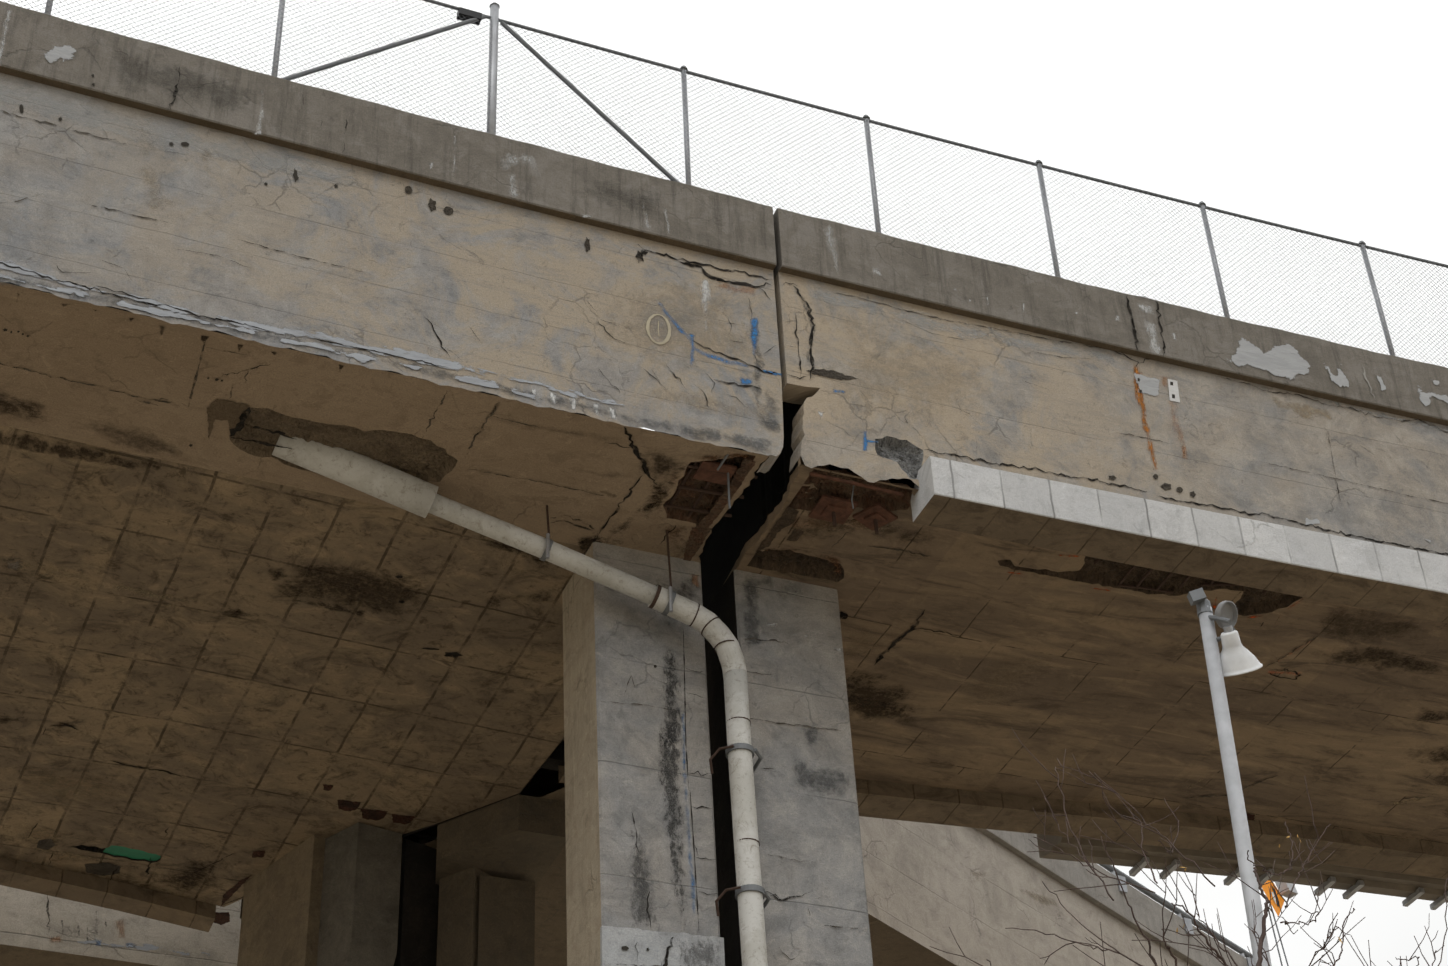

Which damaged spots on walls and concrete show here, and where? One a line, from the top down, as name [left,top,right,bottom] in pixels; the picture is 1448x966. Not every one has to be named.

peeling [0,260,638,408]
crack [586,244,1166,406]
peeling [1227,337,1349,387]
corrosion [1134,367,1156,468]
crack [465,407,657,547]
damp [272,565,422,615]
spalling [747,506,844,582]
spalling [998,556,1303,616]
damp [1326,614,1437,671]
damp [846,674,908,720]
crack [601,630,719,966]
damp [659,653,685,911]